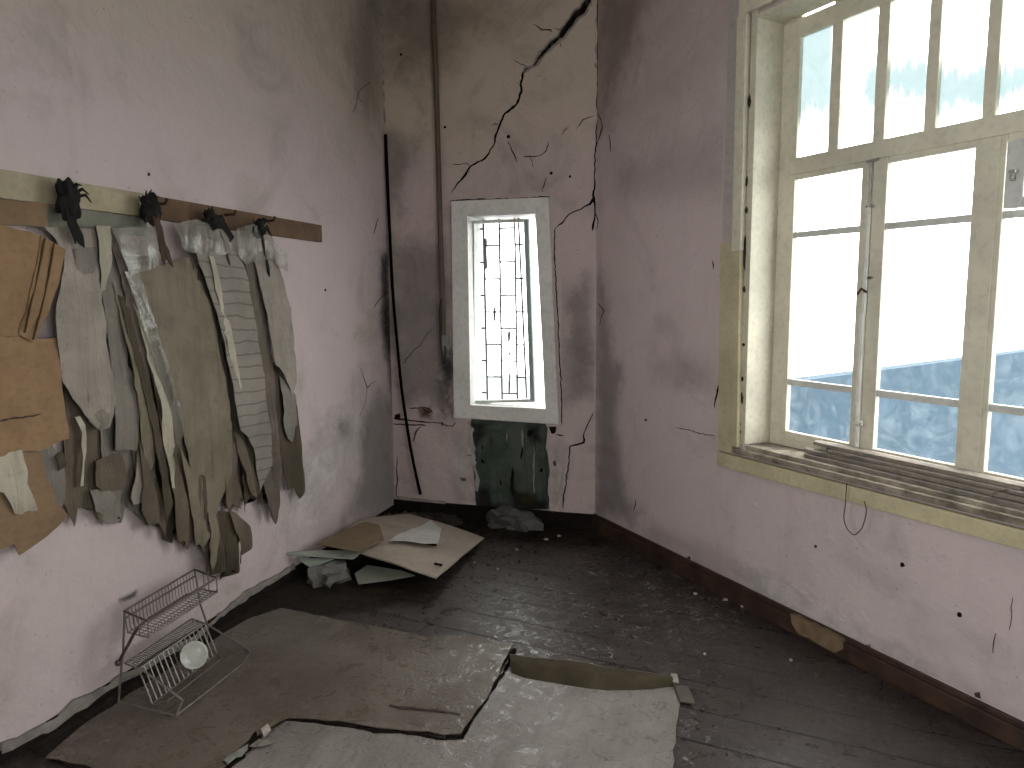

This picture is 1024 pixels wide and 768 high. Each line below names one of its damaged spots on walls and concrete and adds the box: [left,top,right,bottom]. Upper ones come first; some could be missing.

peeling [460,419,556,509]
crack [450,0,611,507]